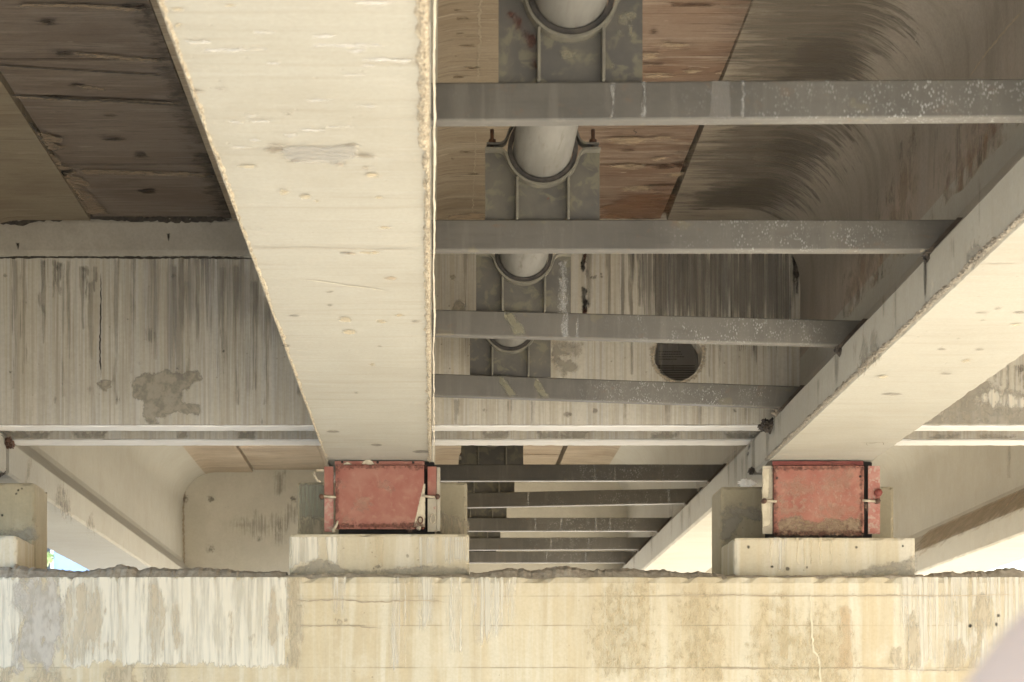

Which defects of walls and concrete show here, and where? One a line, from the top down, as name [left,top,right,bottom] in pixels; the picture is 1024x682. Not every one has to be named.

spalling [158,0,330,466]
crack [0,248,409,369]
leakage [928,382,1024,438]
corrosion [773,464,864,536]
leakage [9,577,68,674]
crack [619,594,1016,682]